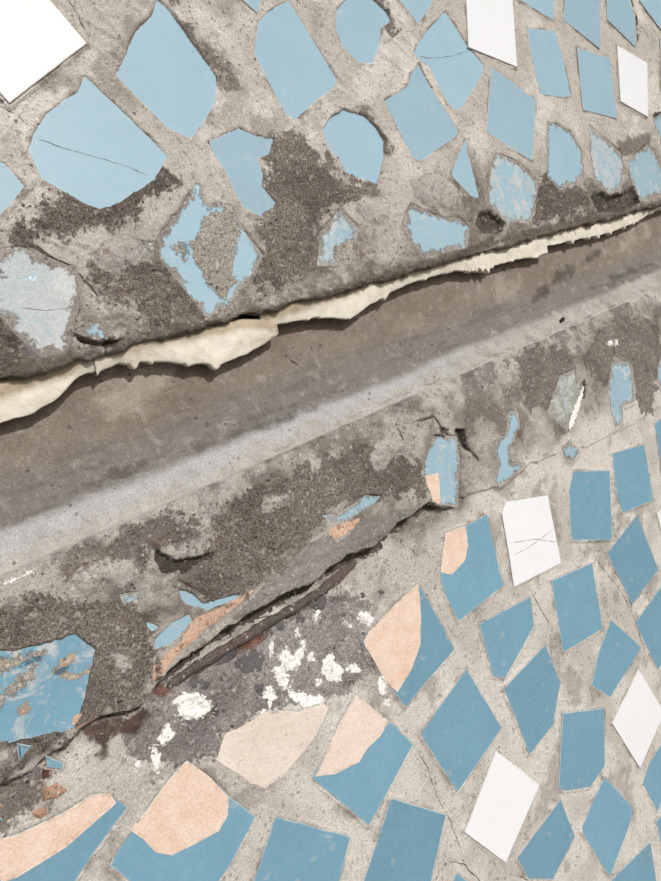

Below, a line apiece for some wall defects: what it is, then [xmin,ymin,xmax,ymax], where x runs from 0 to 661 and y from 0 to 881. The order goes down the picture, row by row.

spalling [0,167,183,249]
spalling [251,127,390,294]
spalling [476,210,507,234]
spalling [532,173,640,225]
spalling [86,259,197,330]
spalling [0,318,23,370]
crack [397,415,479,461]
crack [153,502,455,690]
spalling [0,443,428,837]
crack [91,707,139,722]
crack [0,737,74,785]